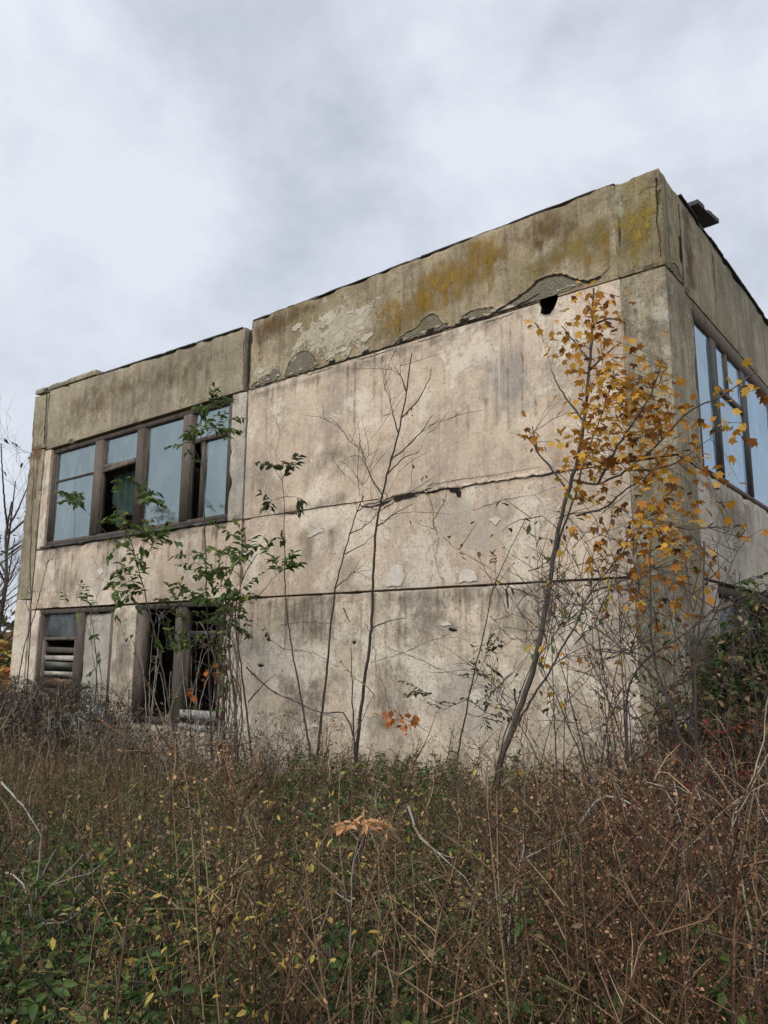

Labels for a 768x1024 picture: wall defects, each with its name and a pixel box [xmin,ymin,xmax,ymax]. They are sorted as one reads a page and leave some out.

crack [645,177,685,285]
peeling [250,291,389,387]
flaking render [394,304,501,344]
hole [540,294,558,316]
peeling [386,564,405,587]
peeling [459,568,477,583]